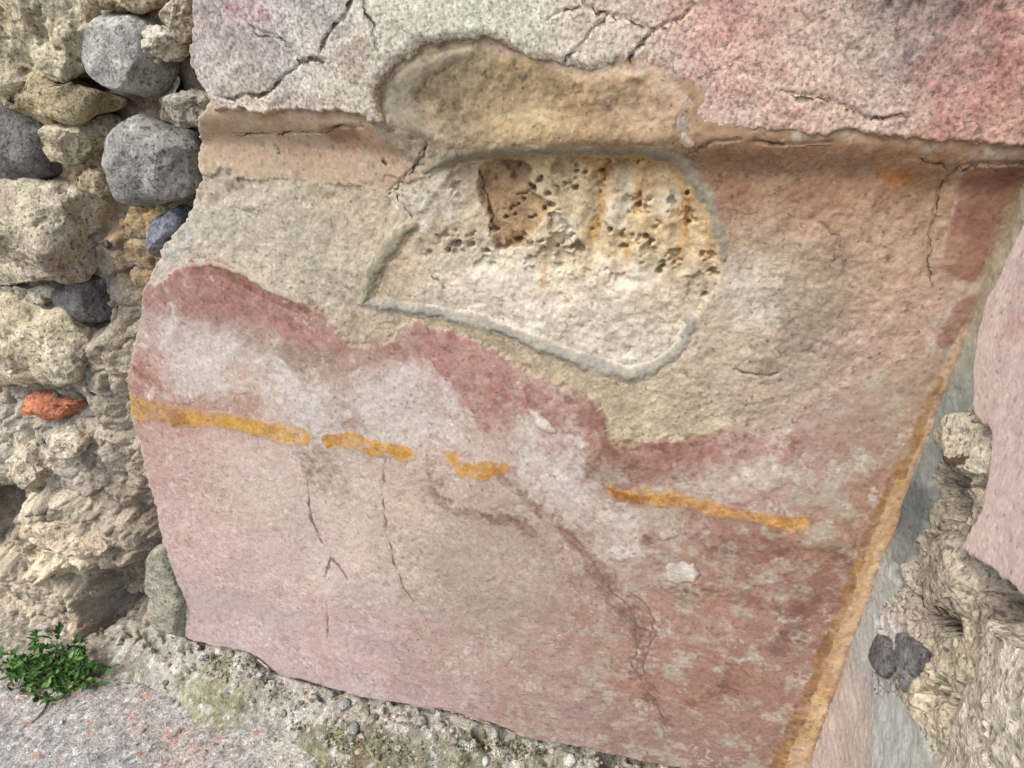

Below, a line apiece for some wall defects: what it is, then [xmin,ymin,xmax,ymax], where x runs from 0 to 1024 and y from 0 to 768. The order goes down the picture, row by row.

crack [217,0,377,101]
crack [548,1,695,62]
peeling [142,39,979,487]
crack [909,155,1024,285]
crack [307,481,347,637]